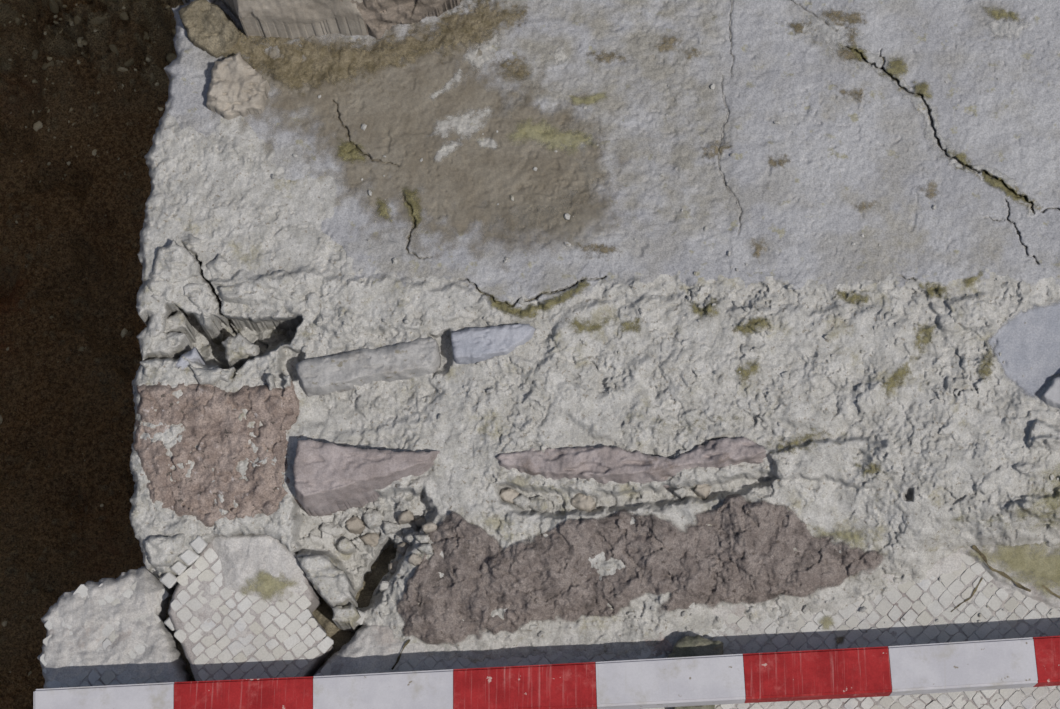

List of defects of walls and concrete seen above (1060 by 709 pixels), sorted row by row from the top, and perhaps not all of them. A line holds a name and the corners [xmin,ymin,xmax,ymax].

crack [337,105,428,259]
water stain [250,22,606,249]
crack [837,43,1056,264]
crack [468,278,602,318]
spalling [988,303,1060,397]
spalling [242,572,293,598]
spalling [397,494,883,645]